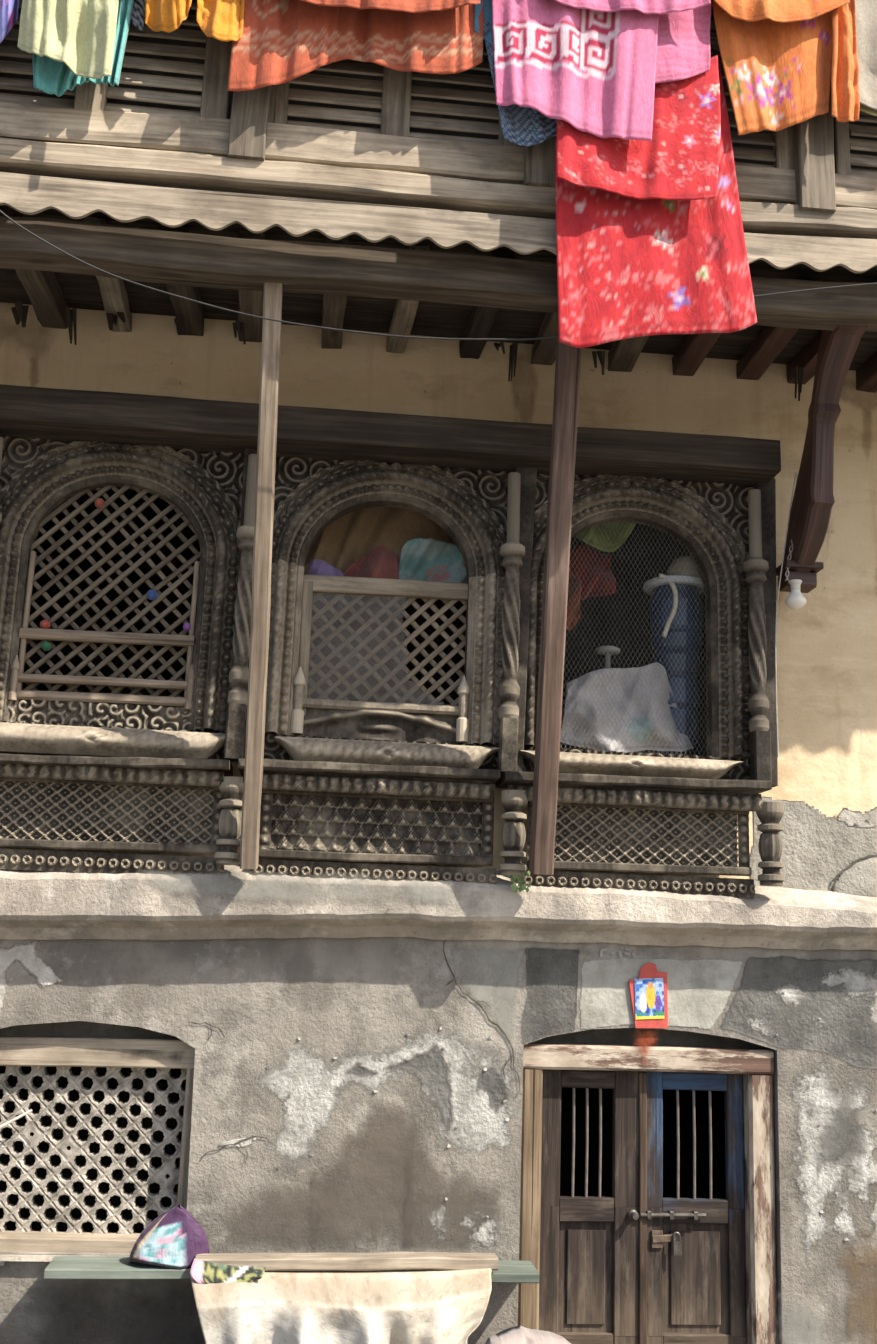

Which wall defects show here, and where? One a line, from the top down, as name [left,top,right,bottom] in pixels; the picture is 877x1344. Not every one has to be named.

flaking render [749,797,877,891]
peeling [0,940,62,1013]
crack [443,941,520,1098]
peeling [776,984,828,1027]
peeling [821,967,877,1023]
peeling [219,1027,518,1169]
peeling [790,1063,877,1262]